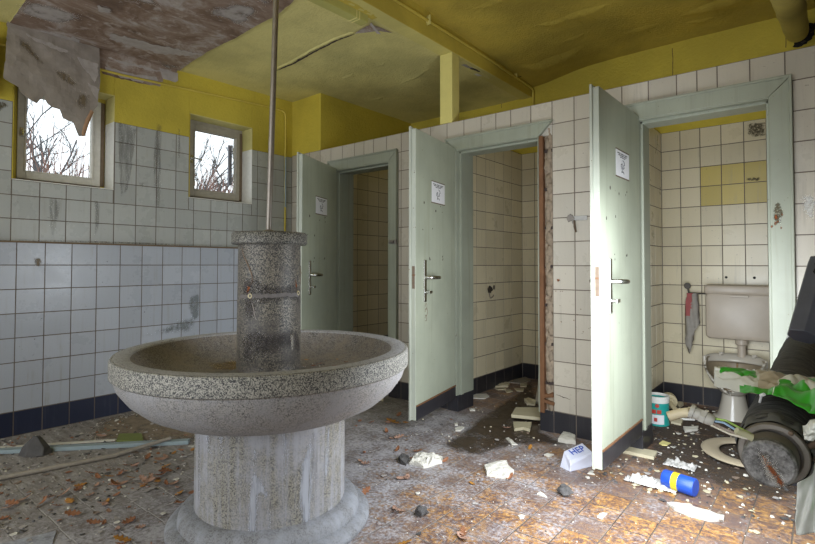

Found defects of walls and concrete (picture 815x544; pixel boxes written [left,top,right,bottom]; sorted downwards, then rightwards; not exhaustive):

peeling [3,0,296,136]
spalling [544,128,555,411]
rust [771,203,783,229]
damp [448,385,563,453]